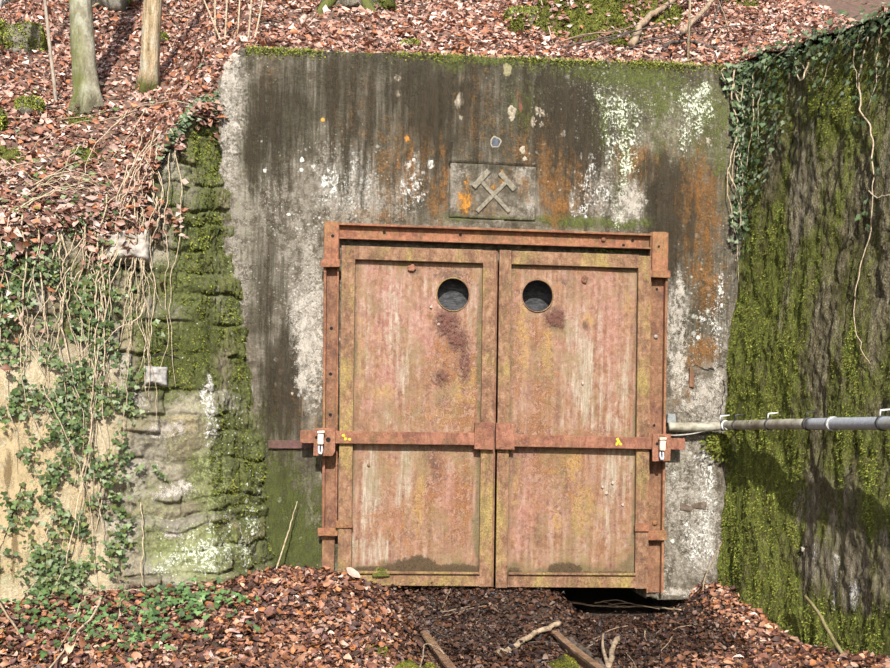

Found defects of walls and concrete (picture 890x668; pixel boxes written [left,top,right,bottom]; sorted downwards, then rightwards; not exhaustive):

leakage [244,64,306,191]
leakage [319,52,376,208]
leakage [387,47,506,206]
leakage [517,65,728,354]
leakage [256,279,305,522]